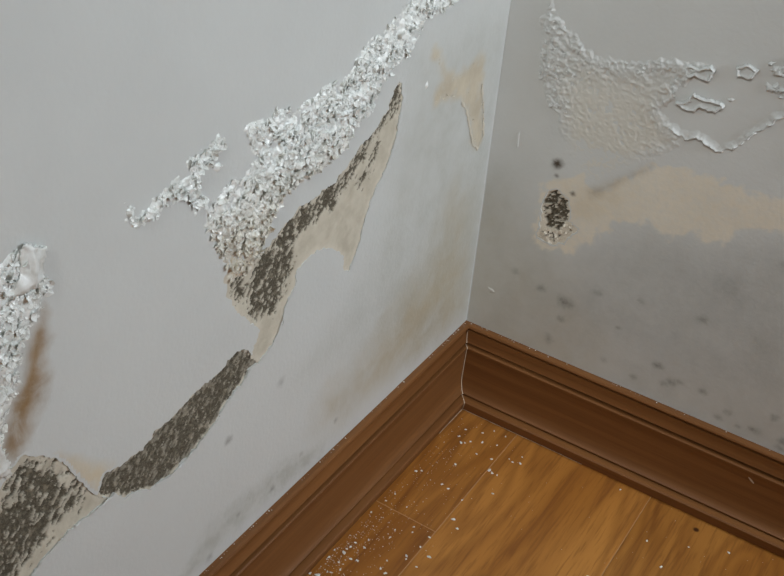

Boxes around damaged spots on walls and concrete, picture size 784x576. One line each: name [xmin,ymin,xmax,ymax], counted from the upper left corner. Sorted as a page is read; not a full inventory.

peeling [0,0,459,576]
damp [173,0,784,576]
flaking render [537,190,578,245]